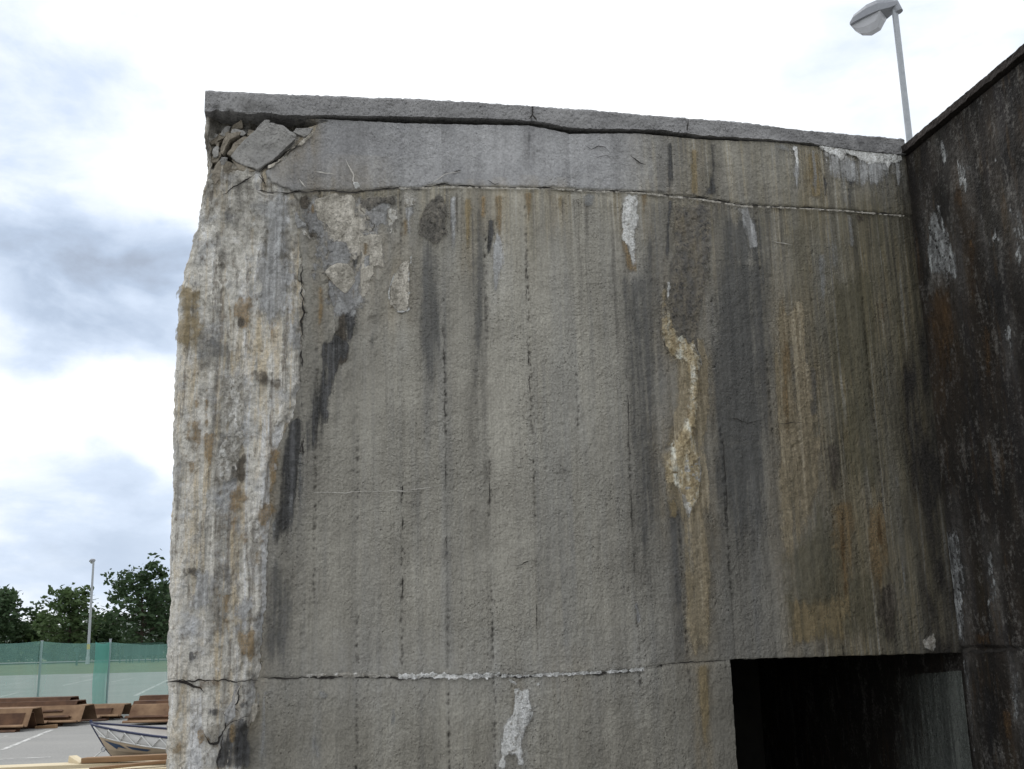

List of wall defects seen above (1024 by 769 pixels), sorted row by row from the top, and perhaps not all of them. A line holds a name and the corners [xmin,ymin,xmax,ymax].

crack [222,132,904,217]
leakage [941,142,969,193]
leakage [741,208,757,248]
leakage [928,206,957,278]
spalling [166,117,412,769]
leakage [273,303,355,541]
crack [265,561,726,684]
leakage [923,634,936,651]
leakage [947,531,965,642]
crack [166,680,203,691]
crack [204,688,248,769]
leakage [912,661,975,769]